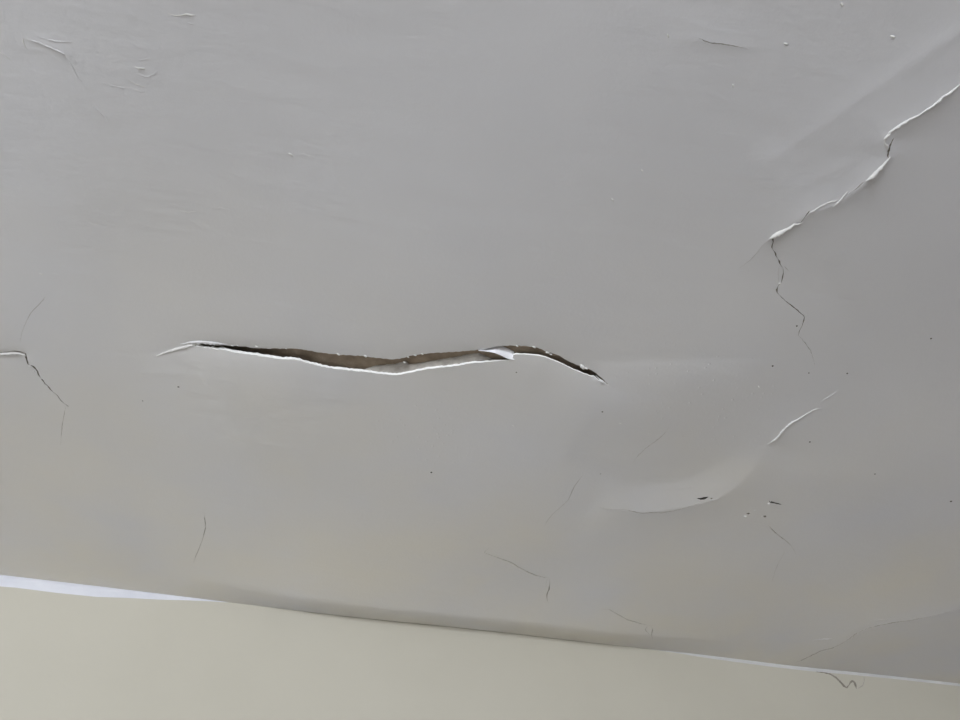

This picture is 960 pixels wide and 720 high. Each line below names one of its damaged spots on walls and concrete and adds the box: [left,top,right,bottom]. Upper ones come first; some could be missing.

crack [745,84,960,365]
crack [0,297,69,436]
crack [157,340,609,386]